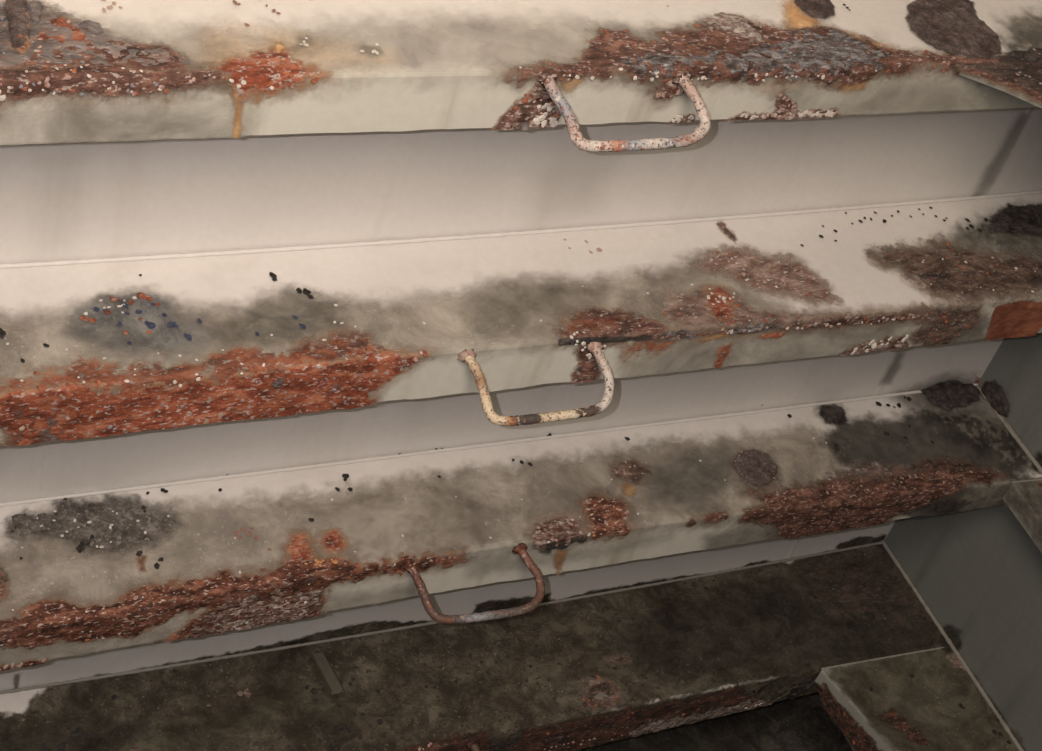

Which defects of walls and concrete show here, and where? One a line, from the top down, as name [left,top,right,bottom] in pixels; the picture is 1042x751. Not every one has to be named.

leakage [123,35,228,65]
rust [0,0,379,138]
leakage [297,23,598,68]
rust [505,12,1042,120]
leakage [1006,16,1042,50]
rust [0,331,428,446]
leakage [0,261,909,392]
rust [553,222,1042,384]
leakage [0,380,1042,620]
rust [686,456,1011,539]
rust [0,518,468,671]
leakage [0,535,1022,751]